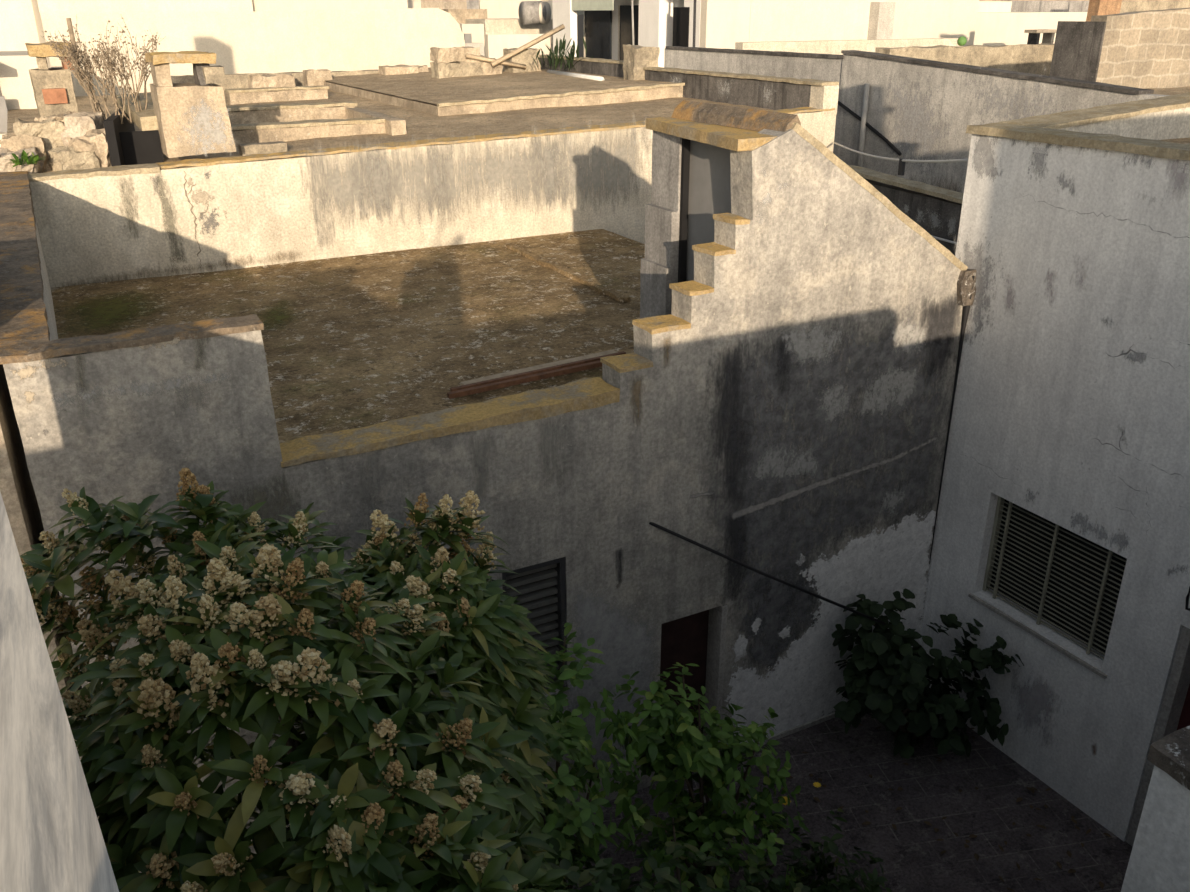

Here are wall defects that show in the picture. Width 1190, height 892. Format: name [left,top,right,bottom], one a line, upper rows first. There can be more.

damp [68,176,252,286]
crack [183,171,209,266]
damp [312,130,637,214]
crack [1106,340,1190,368]
peeling [724,489,938,743]